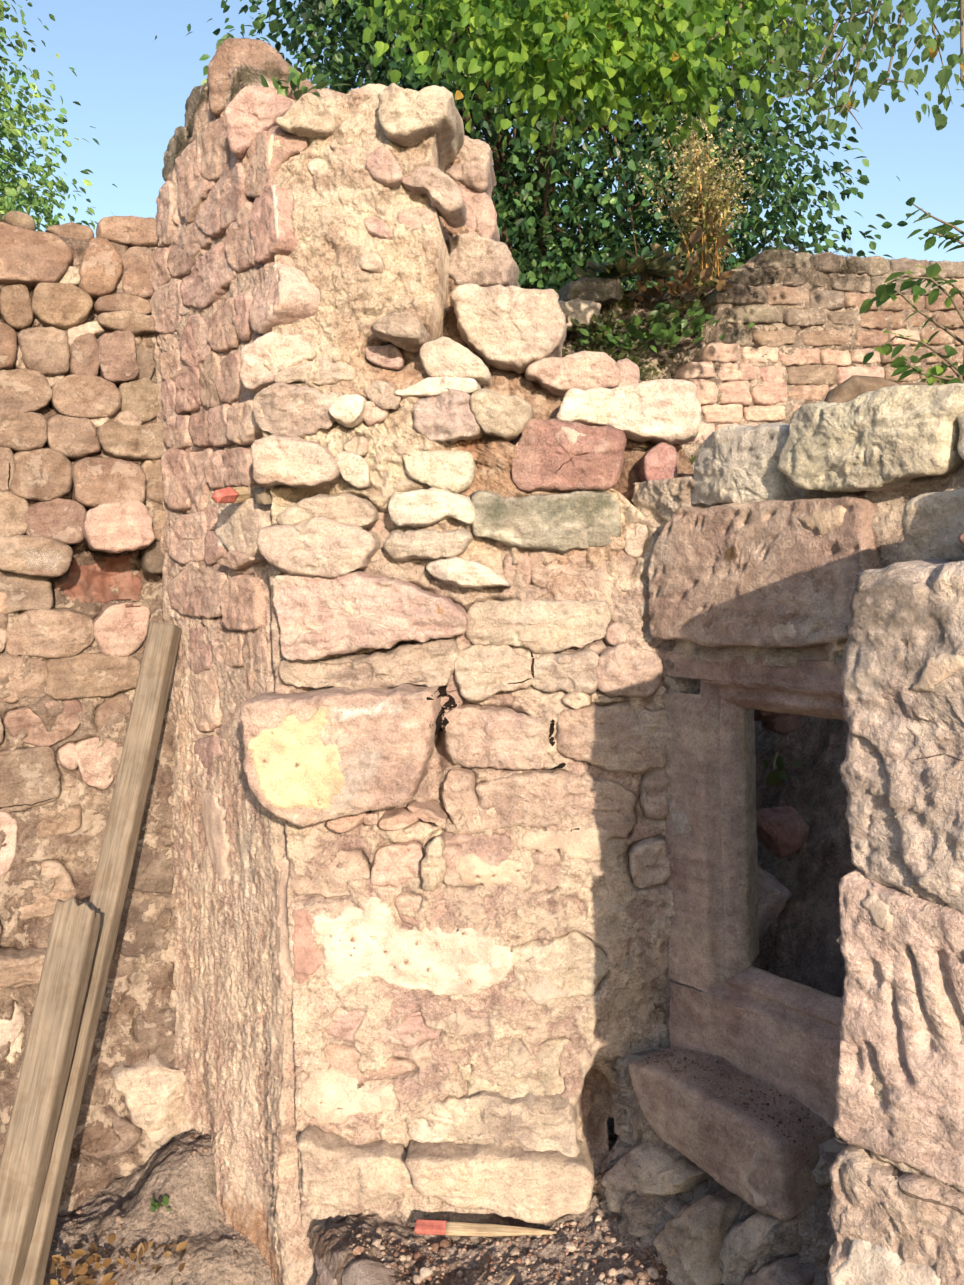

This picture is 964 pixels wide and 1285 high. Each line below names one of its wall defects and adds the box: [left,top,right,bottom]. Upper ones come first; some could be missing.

crack [834,1137,964,1215]